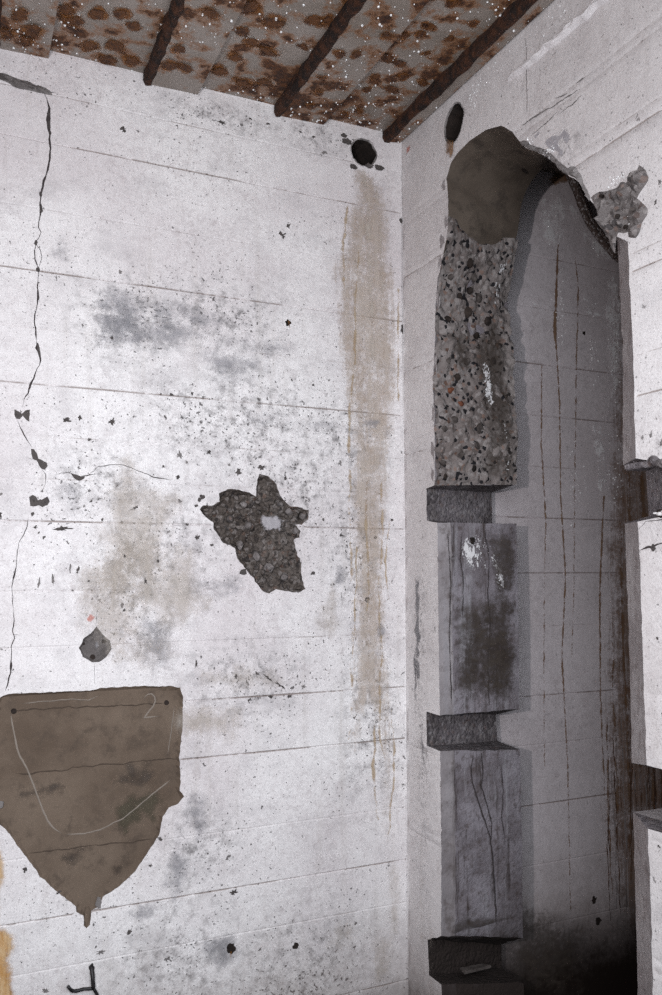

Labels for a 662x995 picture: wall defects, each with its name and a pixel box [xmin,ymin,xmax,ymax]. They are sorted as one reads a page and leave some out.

rust [0,8,47,45]
rust [57,5,141,32]
rust [81,40,140,67]
rust [210,27,279,88]
rust [242,1,286,30]
rust [362,54,429,94]
spalling [520,93,662,263]
spalling [431,216,518,485]
water stain [338,173,399,714]
spalling [194,465,315,593]
water stain [371,729,395,828]
rust [0,931,12,995]